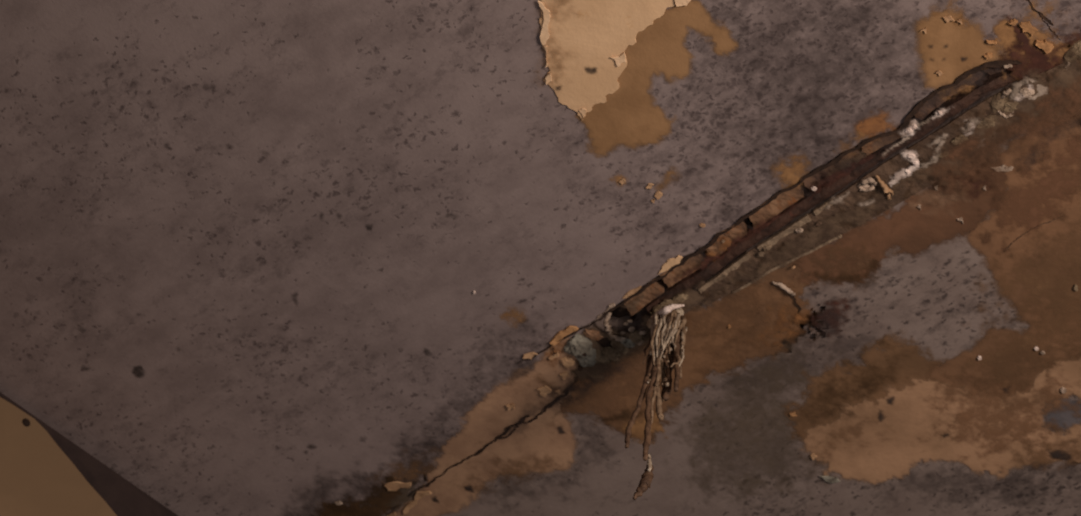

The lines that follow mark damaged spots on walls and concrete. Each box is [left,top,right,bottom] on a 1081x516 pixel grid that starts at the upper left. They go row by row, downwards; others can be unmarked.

peeling [538,0,738,157]
peeling [916,10,1081,89]
crack [1027,0,1058,37]
rust [856,113,897,138]
rust [775,156,805,187]
leakage [541,72,1081,494]
rust [772,281,850,337]
leakage [303,443,434,516]
crack [391,389,569,513]
peeling [801,357,1081,484]